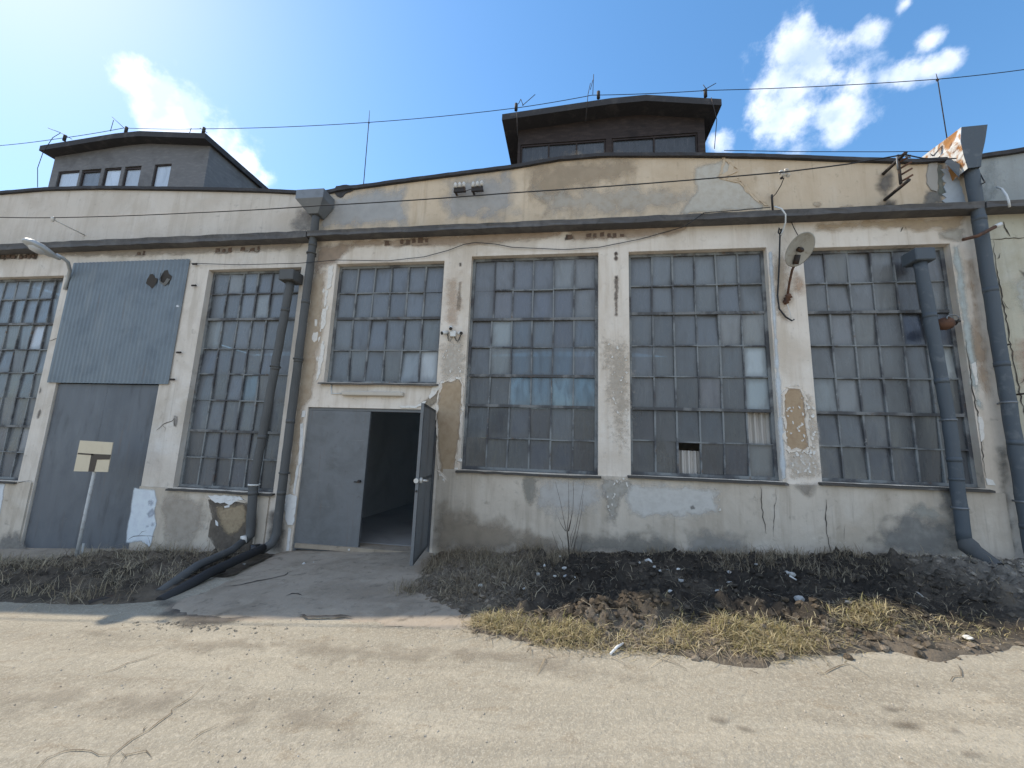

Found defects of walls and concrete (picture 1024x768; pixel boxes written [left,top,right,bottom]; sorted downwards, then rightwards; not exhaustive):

water stain [532,158,692,213]
flaking render [681,158,768,214]
peeling [284,265,333,551]
flaking render [400,373,465,483]
flaking render [781,385,821,478]
spalling [205,495,257,553]
crack [761,489,776,534]